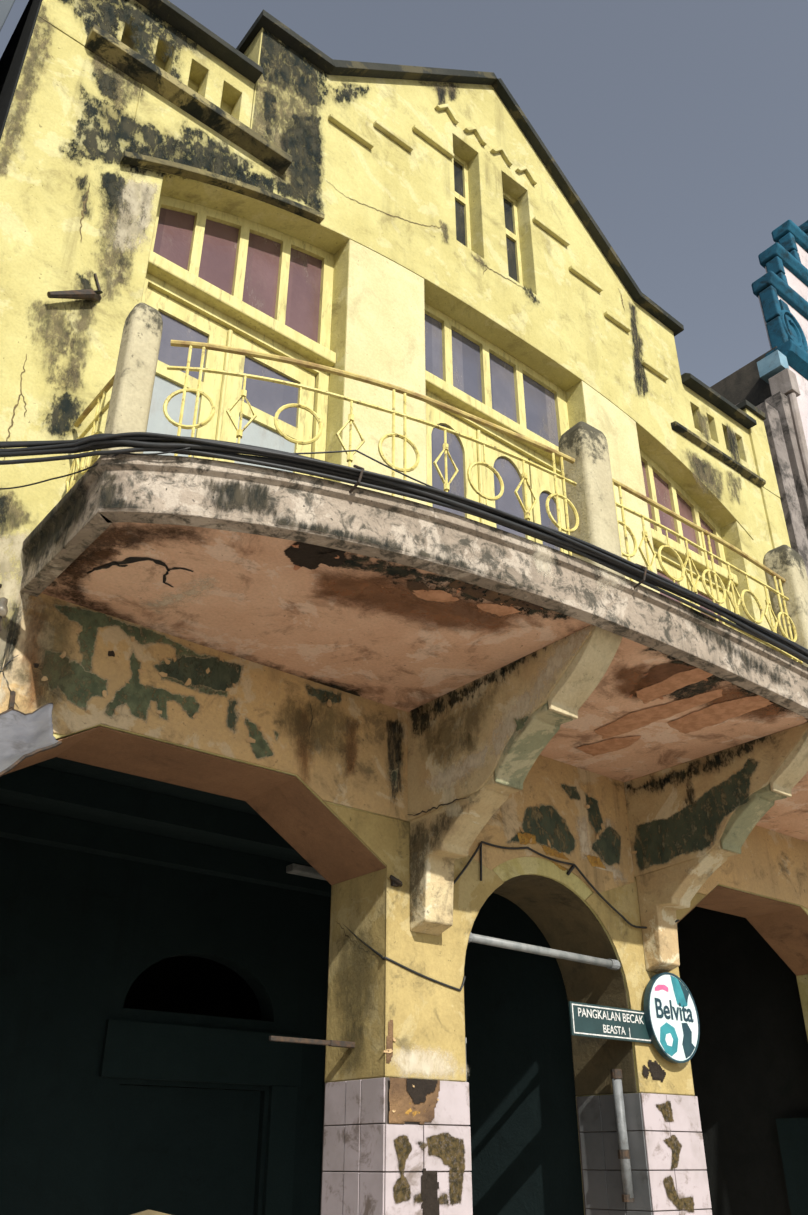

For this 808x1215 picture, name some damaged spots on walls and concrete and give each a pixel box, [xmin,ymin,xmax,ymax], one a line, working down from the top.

water stain [33,28,369,438]
crack [326,180,435,227]
water stain [629,303,648,395]
crack [4,354,27,460]
crack [87,557,193,587]
spalling [284,542,346,570]
water stain [204,479,570,631]
peeling [34,604,279,759]
water stain [225,652,360,696]
water stain [386,631,588,798]
peeling [507,758,759,871]
peeling [643,1060,666,1082]